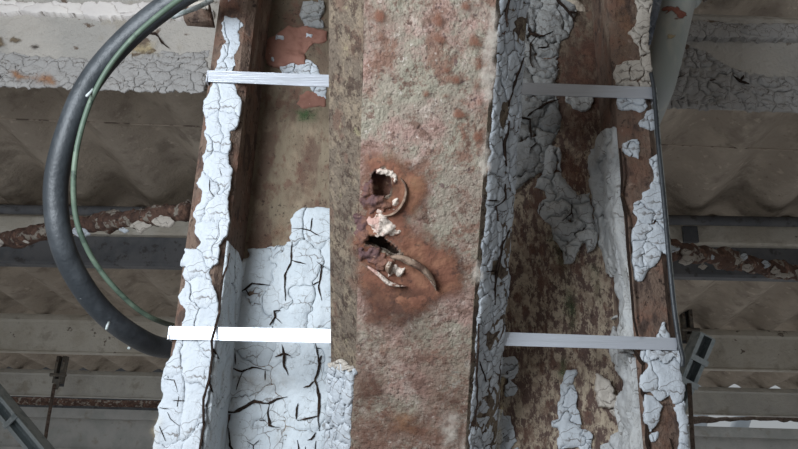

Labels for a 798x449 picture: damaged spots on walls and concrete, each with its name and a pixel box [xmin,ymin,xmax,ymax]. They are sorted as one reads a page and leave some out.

crack [556,0,576,22]
rust [0,223,48,249]
rust [70,200,192,237]
peeling [100,0,331,329]
crack [242,219,322,325]
rust [353,153,462,321]
crack [487,0,560,305]
peeling [468,0,666,449]
rust [12,397,161,408]
crack [159,253,321,449]
peeling [153,339,357,449]
peeling [551,349,690,449]